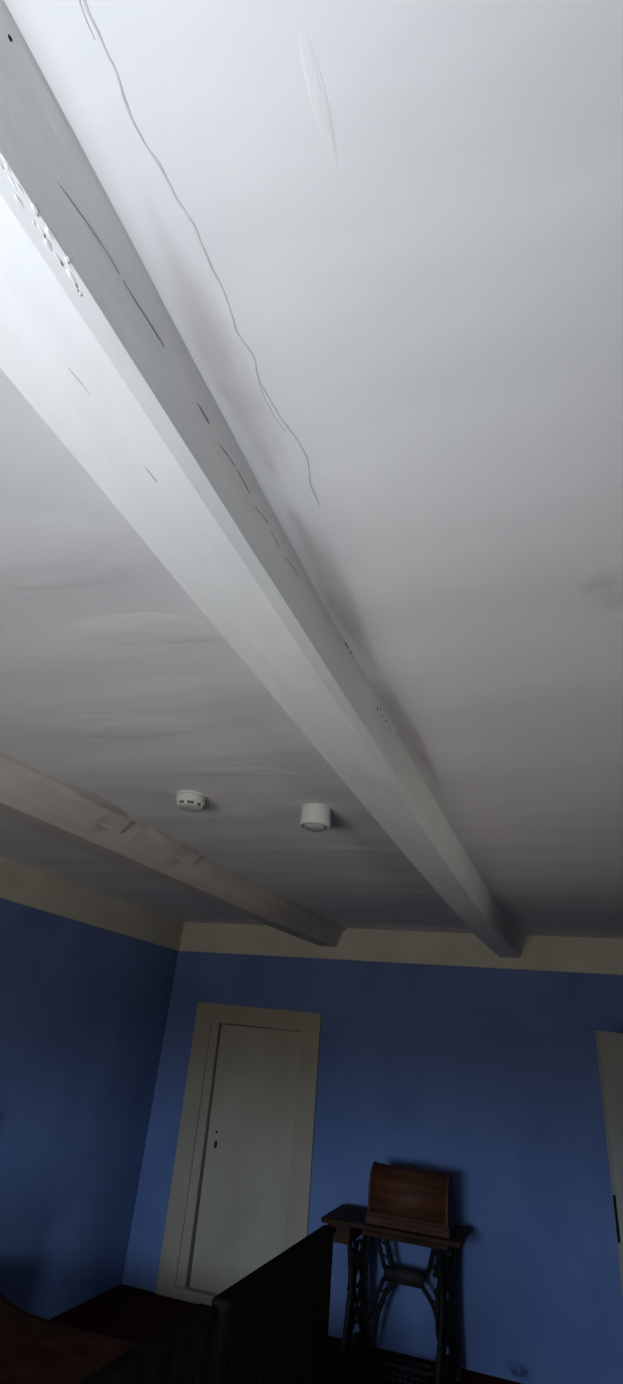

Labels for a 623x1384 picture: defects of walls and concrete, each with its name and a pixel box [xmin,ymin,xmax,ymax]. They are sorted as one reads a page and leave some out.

peeling [0,159,83,296]
crack [58,183,165,348]
crack [79,0,320,506]
crack [197,403,300,578]